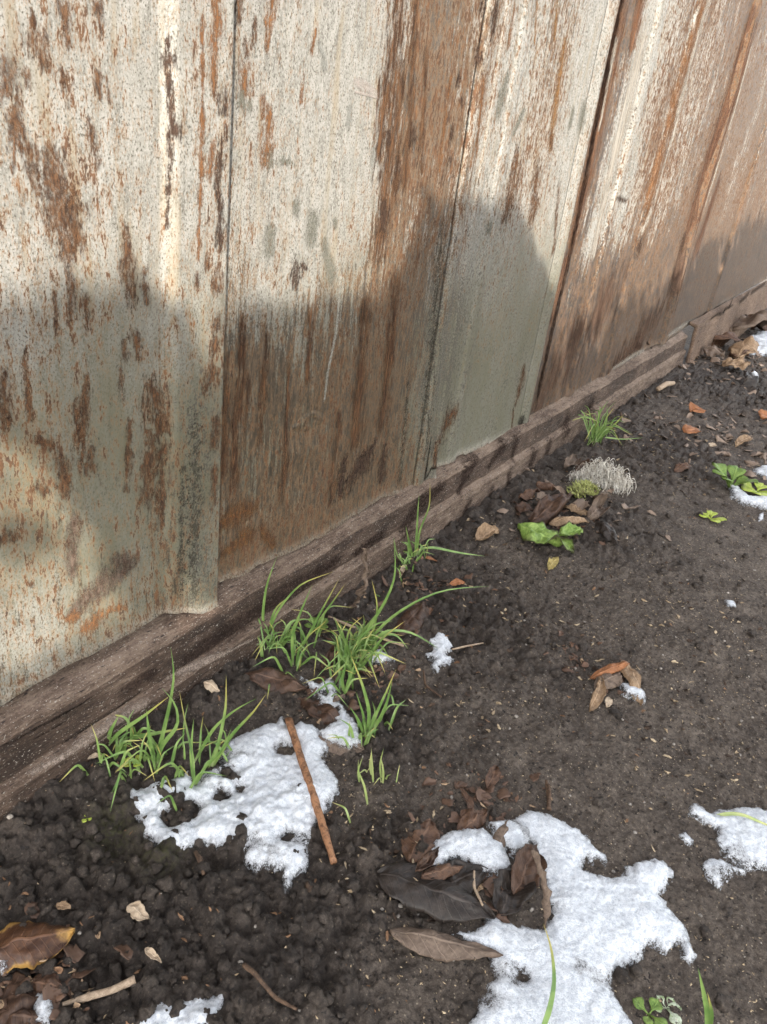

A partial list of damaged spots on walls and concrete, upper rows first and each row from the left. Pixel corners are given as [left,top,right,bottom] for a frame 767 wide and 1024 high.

corrosion [0,8,92,335]
corrosion [93,68,110,103]
corrosion [119,220,149,313]
corrosion [160,35,182,229]
corrosion [197,0,280,261]
corrosion [369,0,429,264]
corrosion [473,0,498,162]
corrosion [500,0,566,231]
corrosion [550,0,645,323]
corrosion [599,0,758,378]
corrosion [31,372,97,510]
corrosion [118,328,174,530]